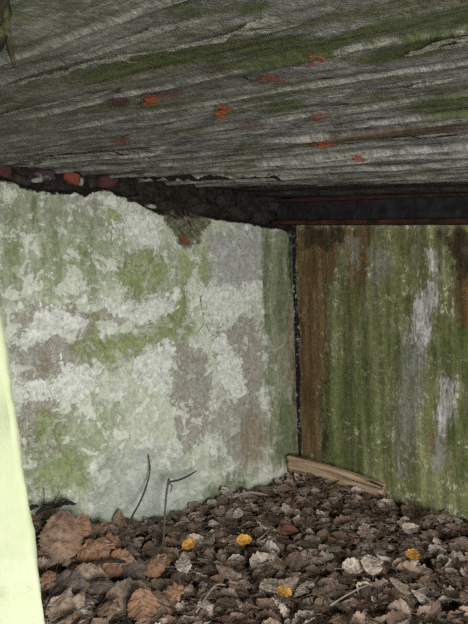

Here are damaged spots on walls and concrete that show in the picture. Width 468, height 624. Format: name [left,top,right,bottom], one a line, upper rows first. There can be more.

water stain [438,228,468,280]
water stain [87,314,105,351]
water stain [169,289,186,334]
water stain [263,242,296,393]
rust [295,225,370,460]
water stain [396,248,441,476]
water stain [430,373,459,472]
water stain [93,455,200,524]